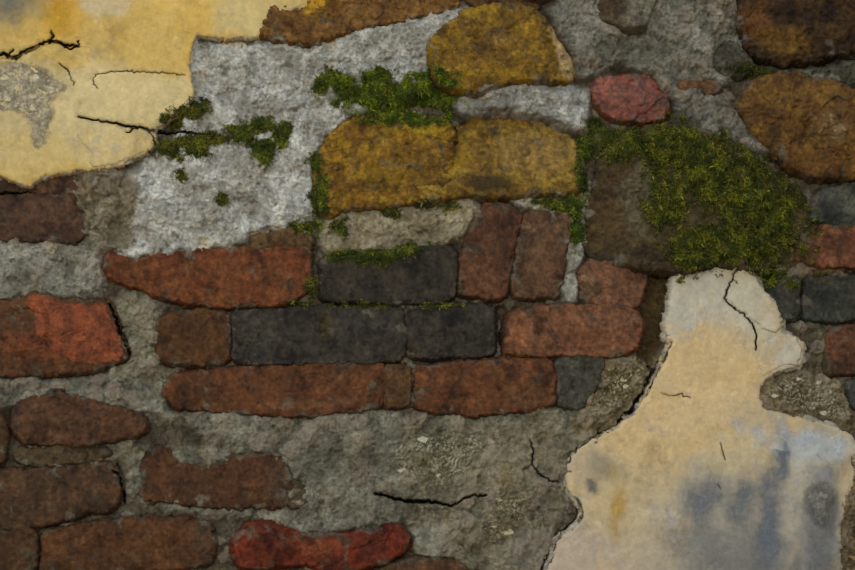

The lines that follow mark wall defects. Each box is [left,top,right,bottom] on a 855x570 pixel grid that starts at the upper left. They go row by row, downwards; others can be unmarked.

crack [0,31,79,81]
spalling [0,62,86,148]
peeling [77,76,195,168]
crack [93,70,182,87]
crack [78,116,231,143]
crack [724,269,758,351]
peeling [730,270,851,423]
spalling [589,355,650,422]
water stain [678,425,813,570]
spalling [804,482,834,526]
spalling [840,454,855,570]